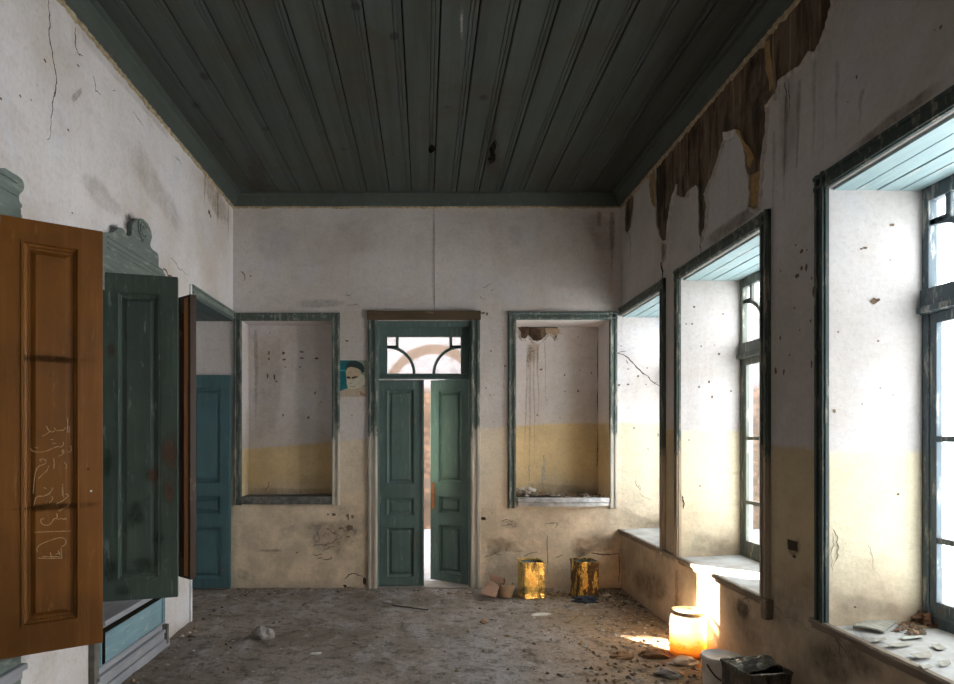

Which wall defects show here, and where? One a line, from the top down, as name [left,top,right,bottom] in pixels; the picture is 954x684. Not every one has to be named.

crack [47,0,82,140]
peeling [649,0,836,245]
peeling [624,194,635,252]
peeling [516,327,565,349]
crack [597,344,659,410]